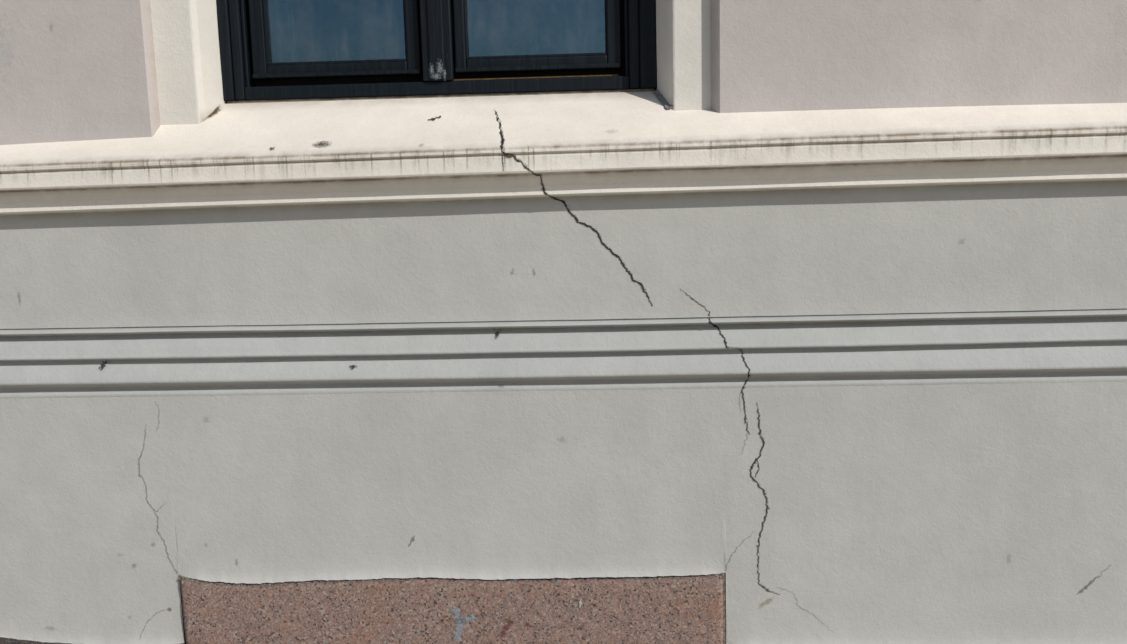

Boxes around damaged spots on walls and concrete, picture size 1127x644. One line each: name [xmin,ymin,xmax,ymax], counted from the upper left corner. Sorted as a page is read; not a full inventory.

crack [495,111,653,306]
crack [685,292,780,595]